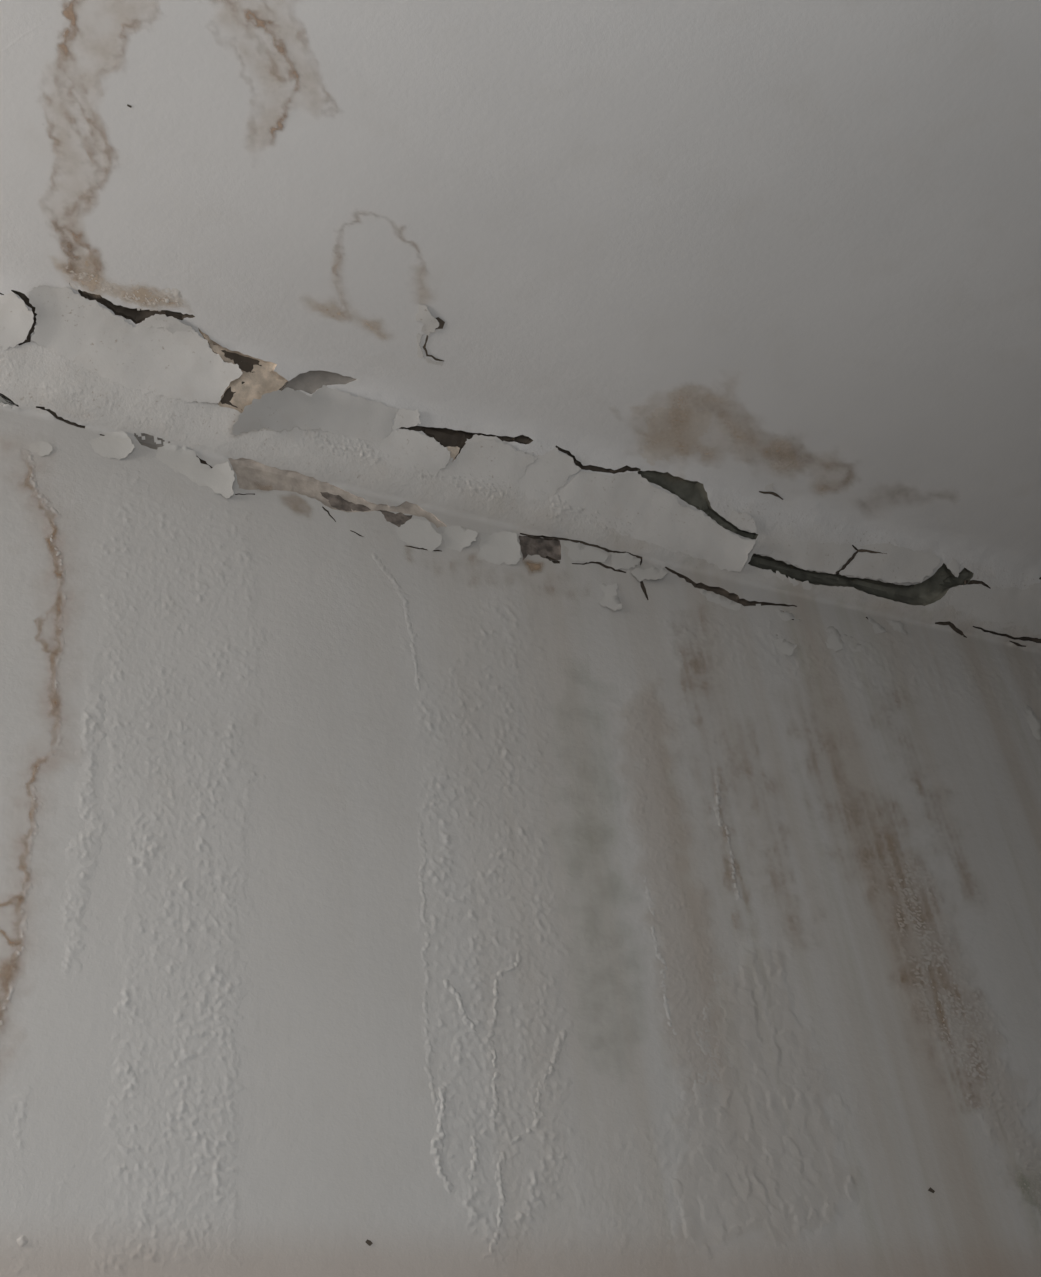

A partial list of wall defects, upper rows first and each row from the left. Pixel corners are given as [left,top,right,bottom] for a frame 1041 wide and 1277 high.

damp [59,0,76,56]
crack [0,290,37,345]
crack [69,283,195,324]
crack [1,396,105,436]
peeling [0,262,991,611]
damp [640,399,713,471]
crack [399,426,758,539]
crack [759,483,783,500]
crack [520,533,797,620]
crack [935,621,1041,647]